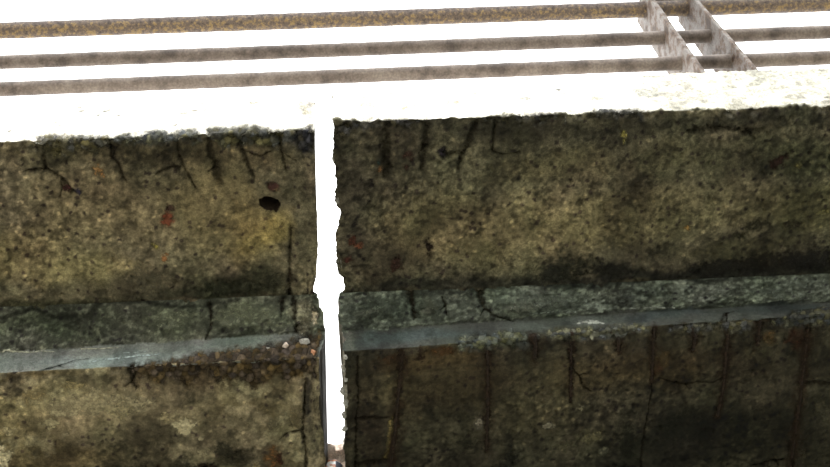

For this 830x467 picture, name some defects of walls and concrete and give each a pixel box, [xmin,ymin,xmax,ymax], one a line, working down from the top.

crack [21,137,73,194]
crack [109,138,127,181]
crack [157,135,221,187]
crack [240,142,291,176]
crack [381,121,393,177]
crack [419,119,502,170]
water stain [538,248,627,282]
water stain [677,244,830,278]
crack [476,289,510,321]
spalling [132,311,323,390]
peeling [17,381,154,430]
peeling [159,412,215,455]